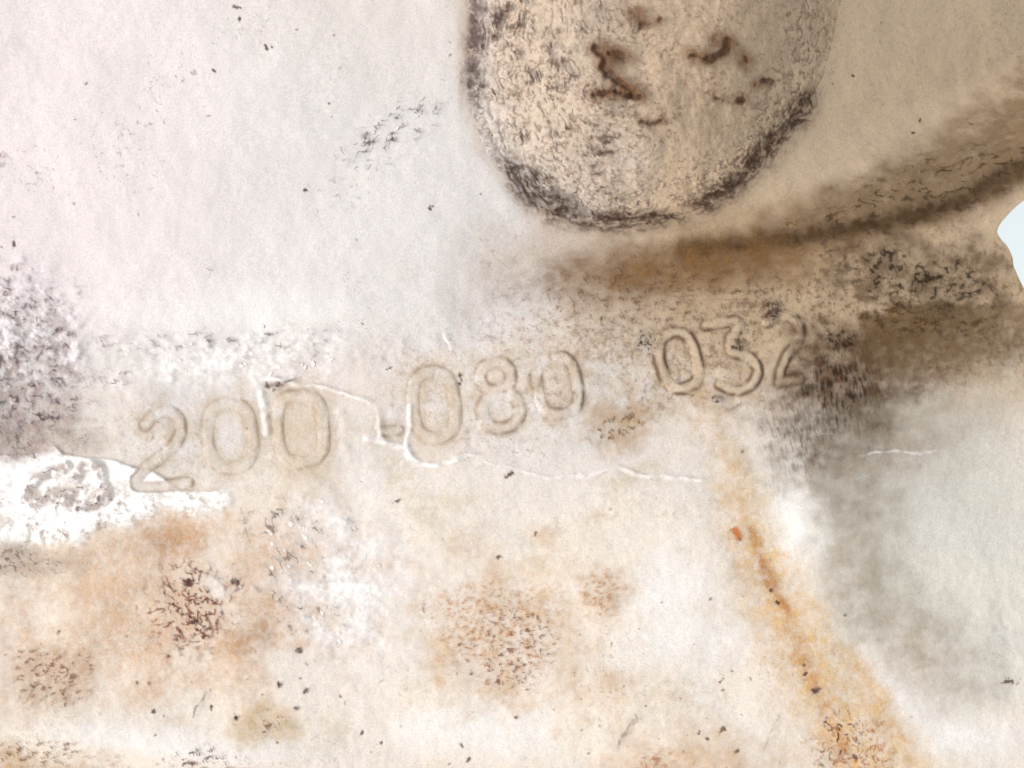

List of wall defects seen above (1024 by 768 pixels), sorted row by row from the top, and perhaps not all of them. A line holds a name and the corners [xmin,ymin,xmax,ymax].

water stain [561,78,1024,484]
crack [258,377,280,435]
crack [363,405,471,468]
rust [22,516,308,699]
rust [450,586,555,684]
rust [732,518,882,768]
rust [1,741,78,768]